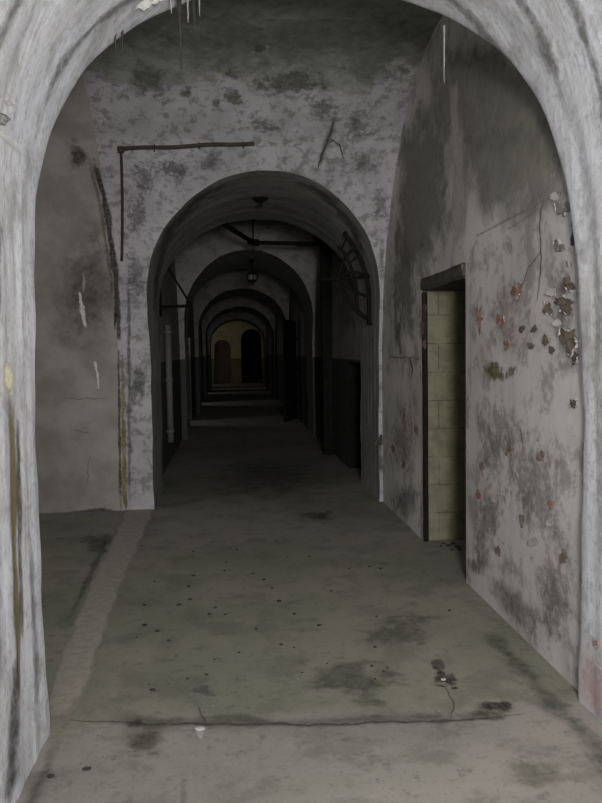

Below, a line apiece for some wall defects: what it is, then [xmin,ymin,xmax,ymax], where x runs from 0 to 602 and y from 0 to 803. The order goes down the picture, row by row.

peeling [134,0,163,11]
damp [519,0,557,71]
damp [569,0,588,47]